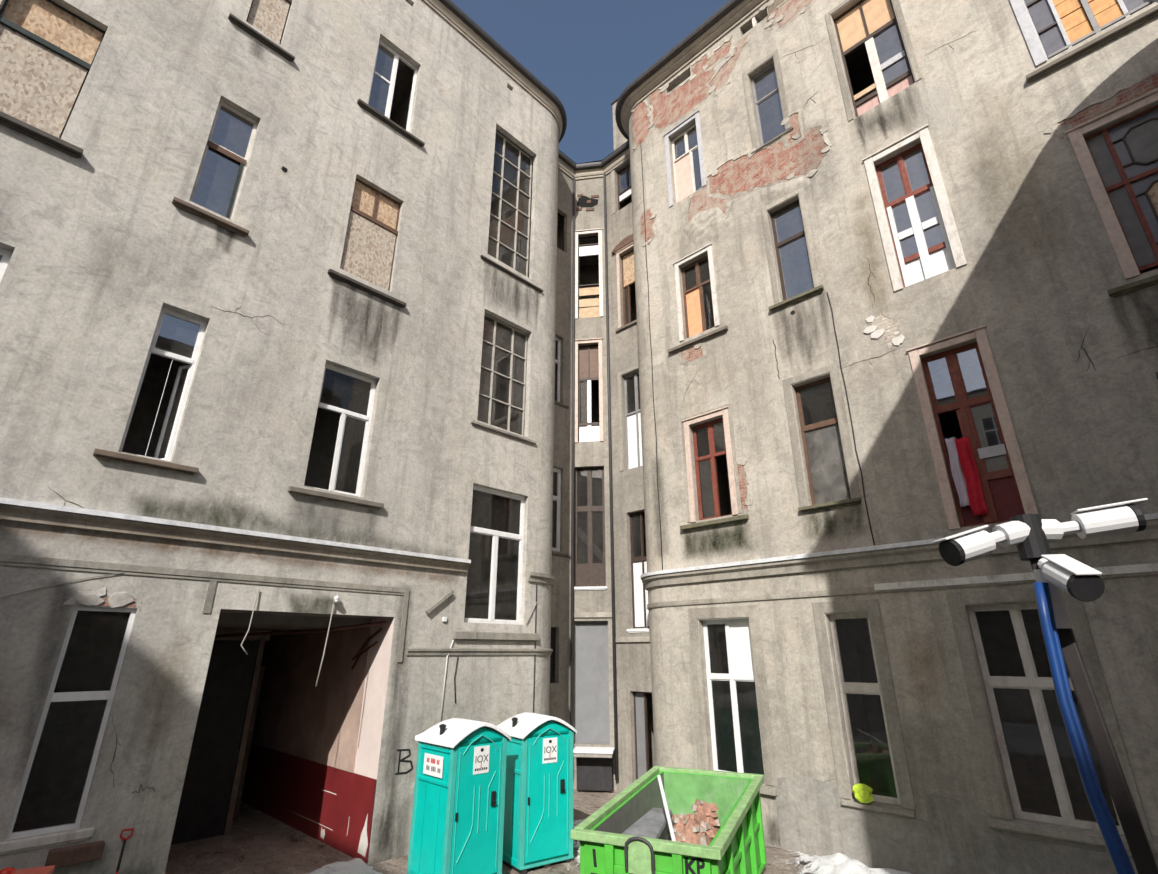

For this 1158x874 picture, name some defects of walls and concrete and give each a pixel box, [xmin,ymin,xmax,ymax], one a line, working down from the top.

flaking render [630,0,816,152]
flaking render [1044,72,1158,140]
flaking render [684,109,833,225]
flaking render [863,310,907,352]